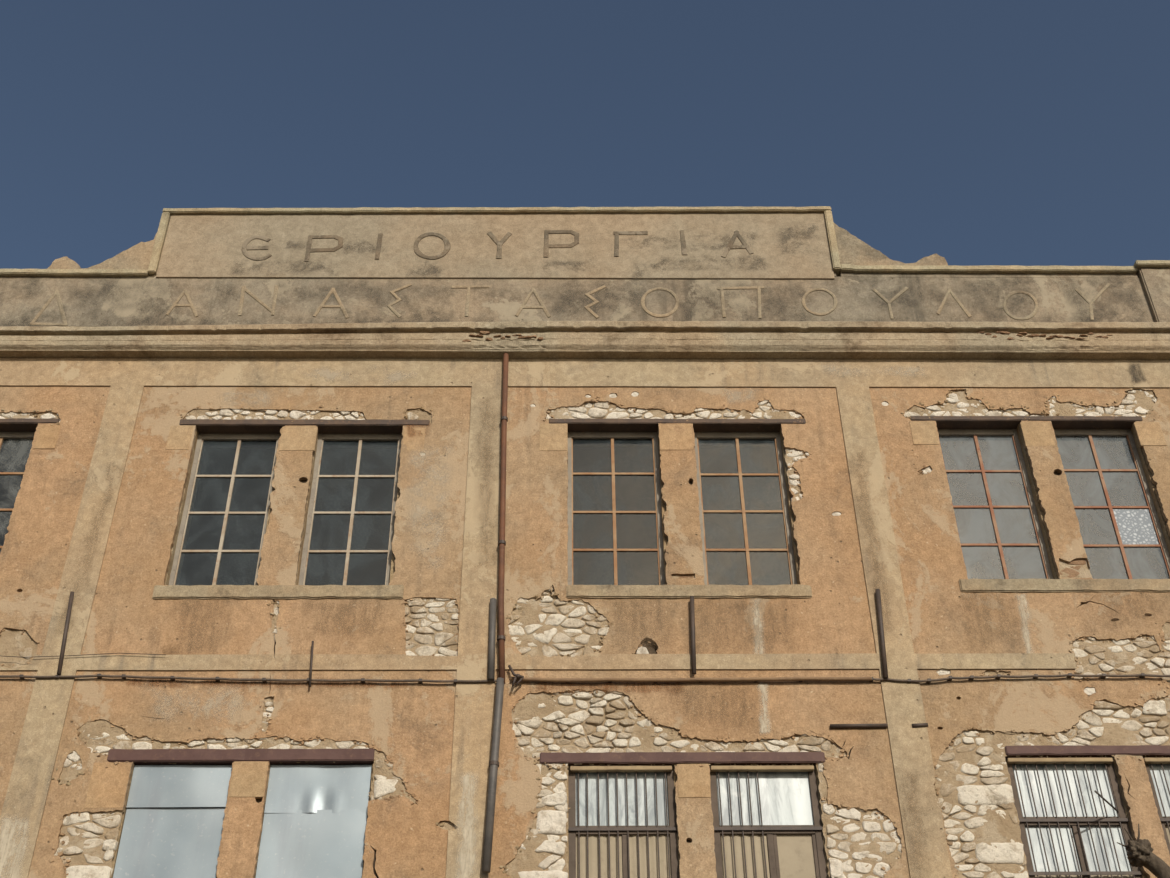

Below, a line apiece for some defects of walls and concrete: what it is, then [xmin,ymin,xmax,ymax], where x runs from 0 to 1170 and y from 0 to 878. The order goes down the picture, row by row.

spalling [0,409,61,425]
spalling [181,405,366,422]
spalling [530,392,805,422]
spalling [901,388,1157,419]
spalling [785,448,811,501]
spalling [401,597,460,656]
spalling [505,588,613,657]
spalling [51,695,418,804]
spalling [934,619,1170,878]
spalling [499,686,905,878]
spalling [49,808,123,878]